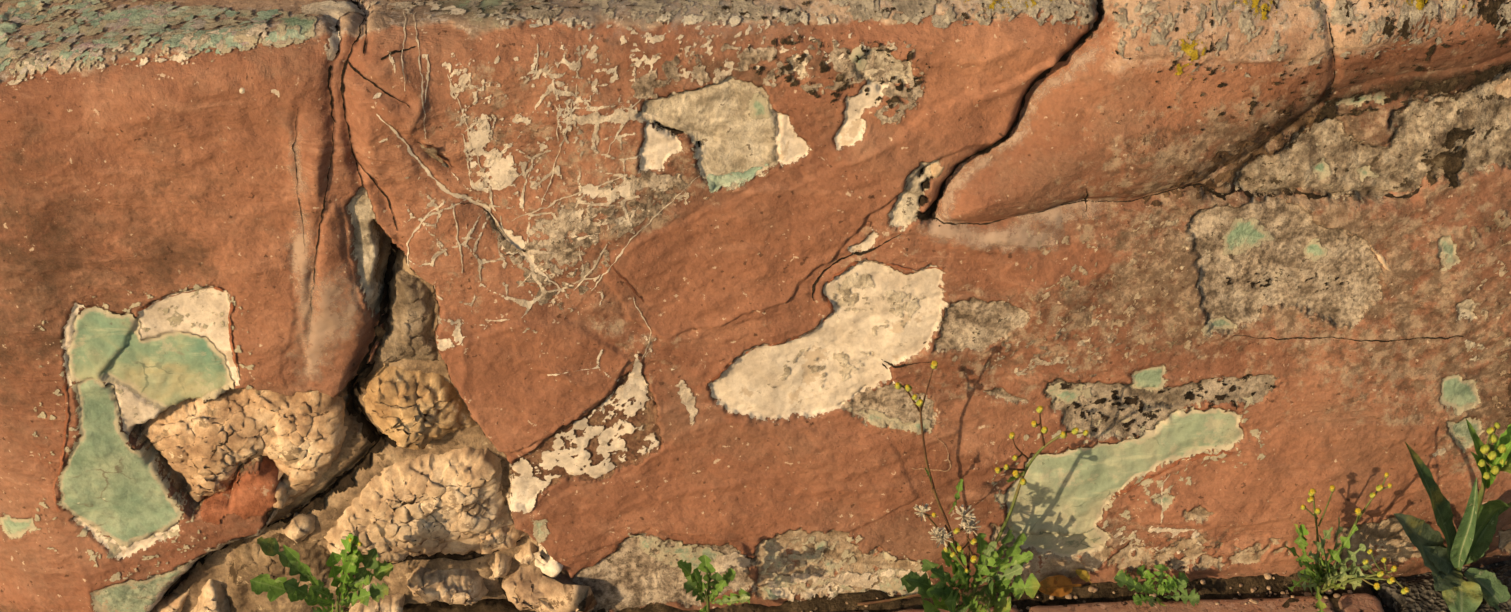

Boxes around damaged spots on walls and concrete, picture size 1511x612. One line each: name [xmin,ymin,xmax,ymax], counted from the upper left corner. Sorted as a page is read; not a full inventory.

peeling [0,0,317,86]
spalling [0,186,933,612]
crack [267,0,702,527]
peeling [442,24,931,312]
crack [812,234,901,301]
peeling [676,65,1511,585]
crack [933,0,1422,225]
crack [164,544,229,598]
crack [387,540,520,600]